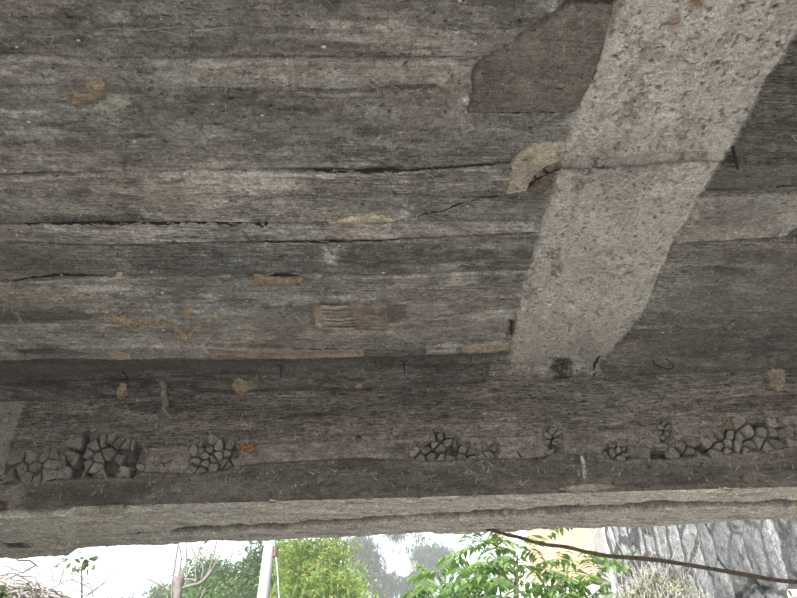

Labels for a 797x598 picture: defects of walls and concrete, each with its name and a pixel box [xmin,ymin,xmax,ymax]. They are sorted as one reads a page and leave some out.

crack [303,162,504,174]
spalling [507,140,565,194]
crack [527,169,561,190]
crack [25,195,505,244]